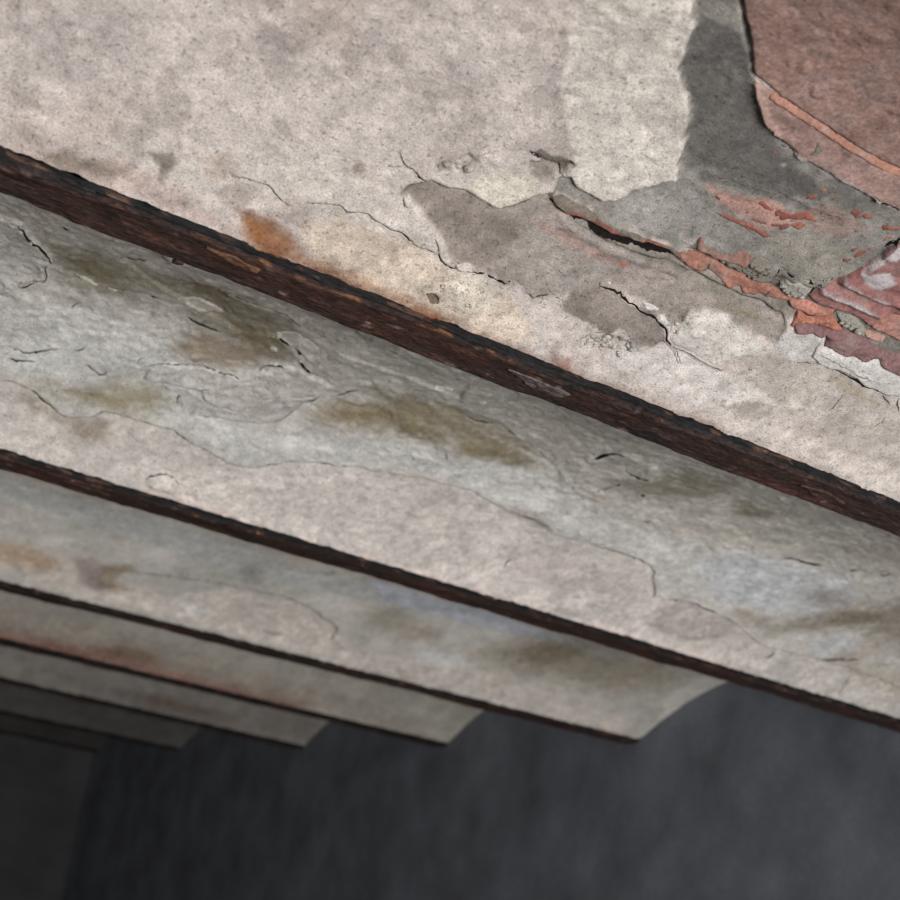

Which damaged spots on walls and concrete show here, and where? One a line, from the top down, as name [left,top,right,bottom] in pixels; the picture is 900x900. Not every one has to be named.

crack [388,151,498,209]
spalling [403,0,900,376]
rust [247,219,291,256]
crack [232,174,566,300]
crack [118,254,147,262]
crack [188,317,219,333]
damp [189,284,291,351]
crack [599,281,724,372]
crack [9,345,108,377]
crack [273,389,359,423]
crack [465,414,516,437]